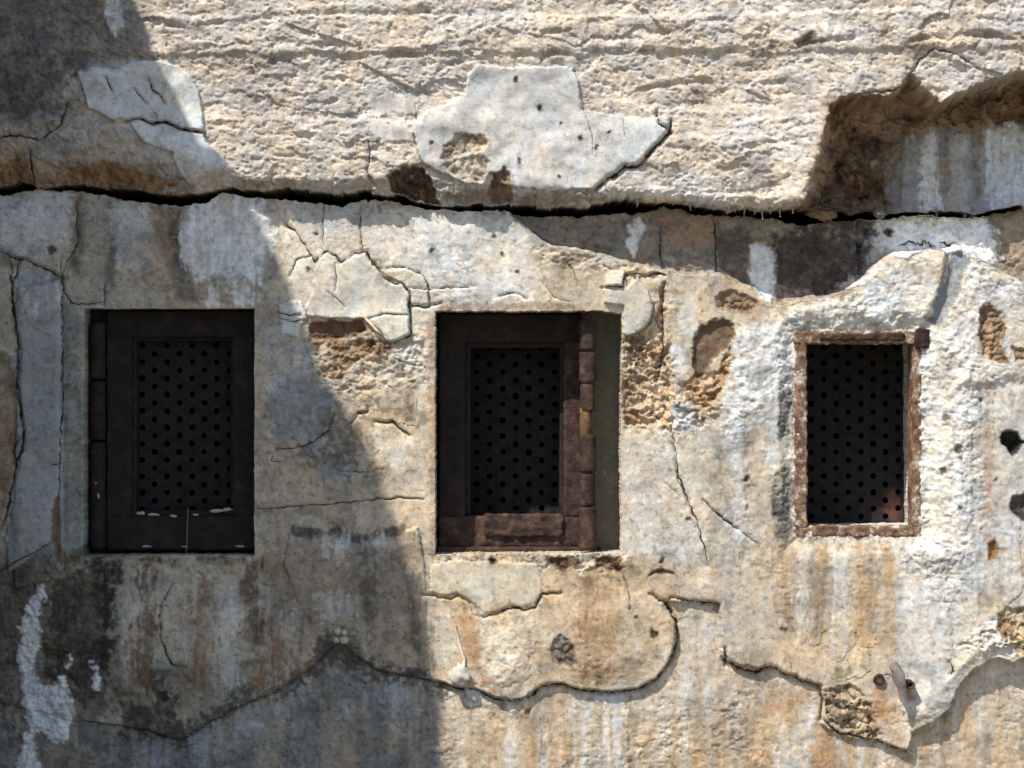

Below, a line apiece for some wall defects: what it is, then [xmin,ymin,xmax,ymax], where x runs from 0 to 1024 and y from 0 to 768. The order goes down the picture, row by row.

spalling [815,90,893,213]
crack [3,210,105,496]
crack [287,207,476,343]
damp [665,395,705,438]
crack [666,428,708,564]
spalling [622,283,762,429]
damp [711,117,1024,681]
spalling [976,300,1024,366]
hole [999,428,1024,458]
damp [14,520,631,768]
crack [363,571,719,702]
damp [672,675,852,768]